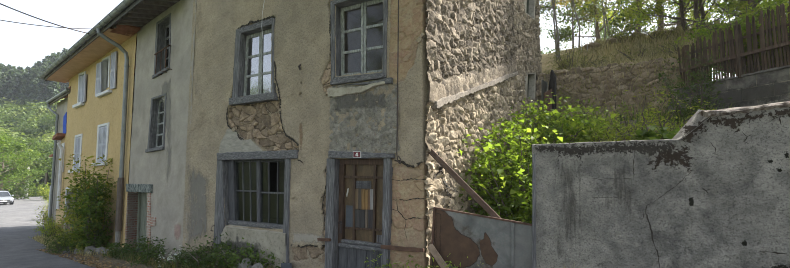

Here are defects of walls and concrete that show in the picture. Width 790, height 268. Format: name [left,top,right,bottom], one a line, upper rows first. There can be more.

flaking render [389,0,428,84]
flaking render [227,100,299,151]
flaking render [390,159,429,268]
corrosion [433,209,498,268]
crack [643,173,690,268]